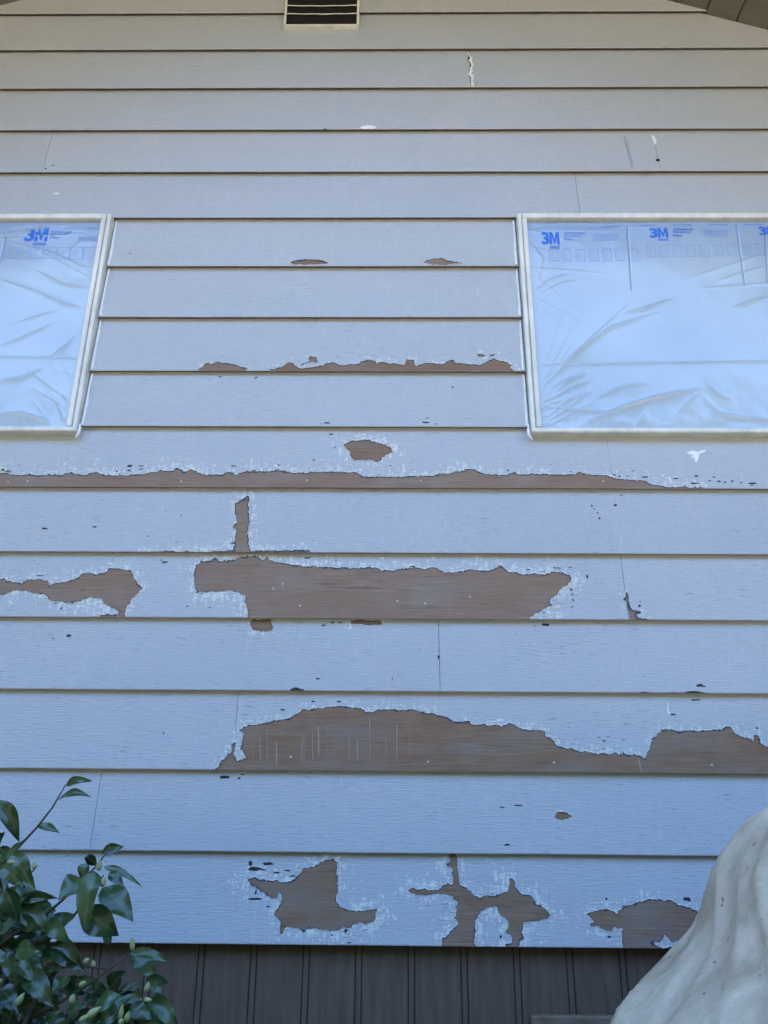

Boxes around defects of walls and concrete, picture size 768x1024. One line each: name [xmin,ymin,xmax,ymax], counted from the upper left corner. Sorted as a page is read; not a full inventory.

crack [467,53,477,87]
peeling [289,255,333,265]
peeling [198,359,258,379]
peeling [268,349,521,371]
peeling [0,422,756,638]
peeling [209,687,768,779]
peeling [227,852,698,948]